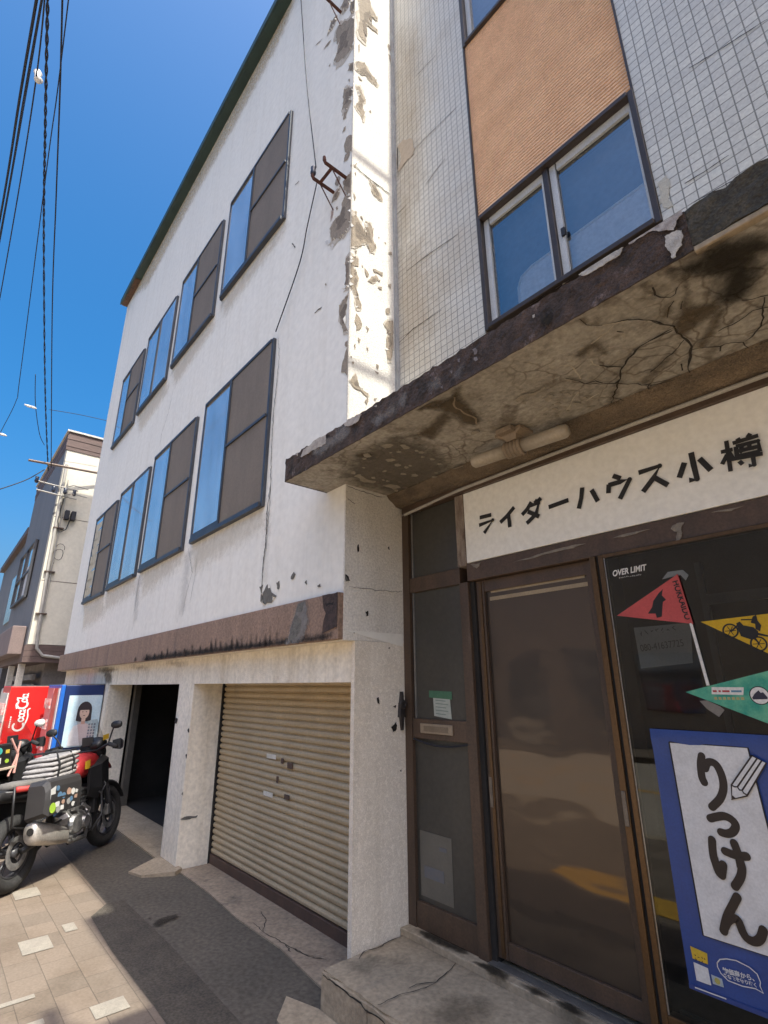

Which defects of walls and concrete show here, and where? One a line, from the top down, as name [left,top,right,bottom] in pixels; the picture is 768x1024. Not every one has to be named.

peeling [315,0,394,426]
spalling [579,210,683,276]
water stain [663,236,768,347]
crack [564,287,768,411]
peeling [295,435,326,457]
peeling [351,444,442,492]
water stain [342,385,479,493]
water stain [134,634,329,661]
spalling [260,572,338,645]
crack [255,912,456,1024]